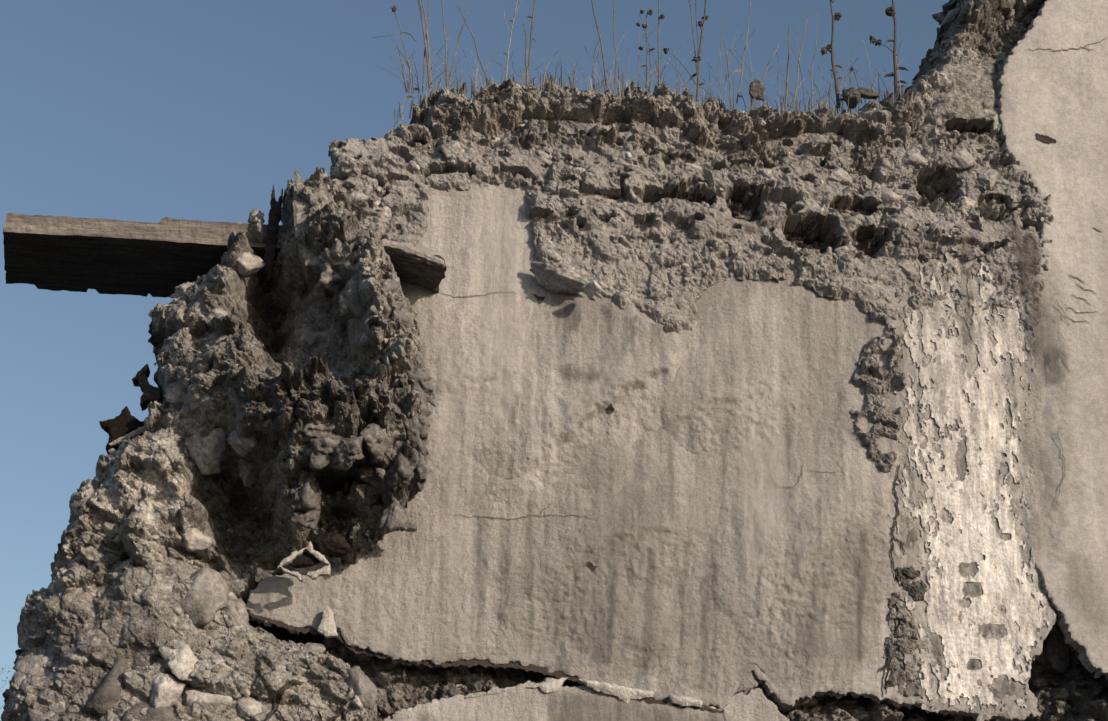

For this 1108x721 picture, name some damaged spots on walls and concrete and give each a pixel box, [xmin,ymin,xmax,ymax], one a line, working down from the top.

hole [945,119,995,138]
flaking render [1036,133,1057,144]
hole [578,183,761,222]
spalling [916,165,956,203]
hole [783,195,885,257]
peeling [735,250,1108,721]
crack [447,503,594,520]
crack [248,606,758,721]